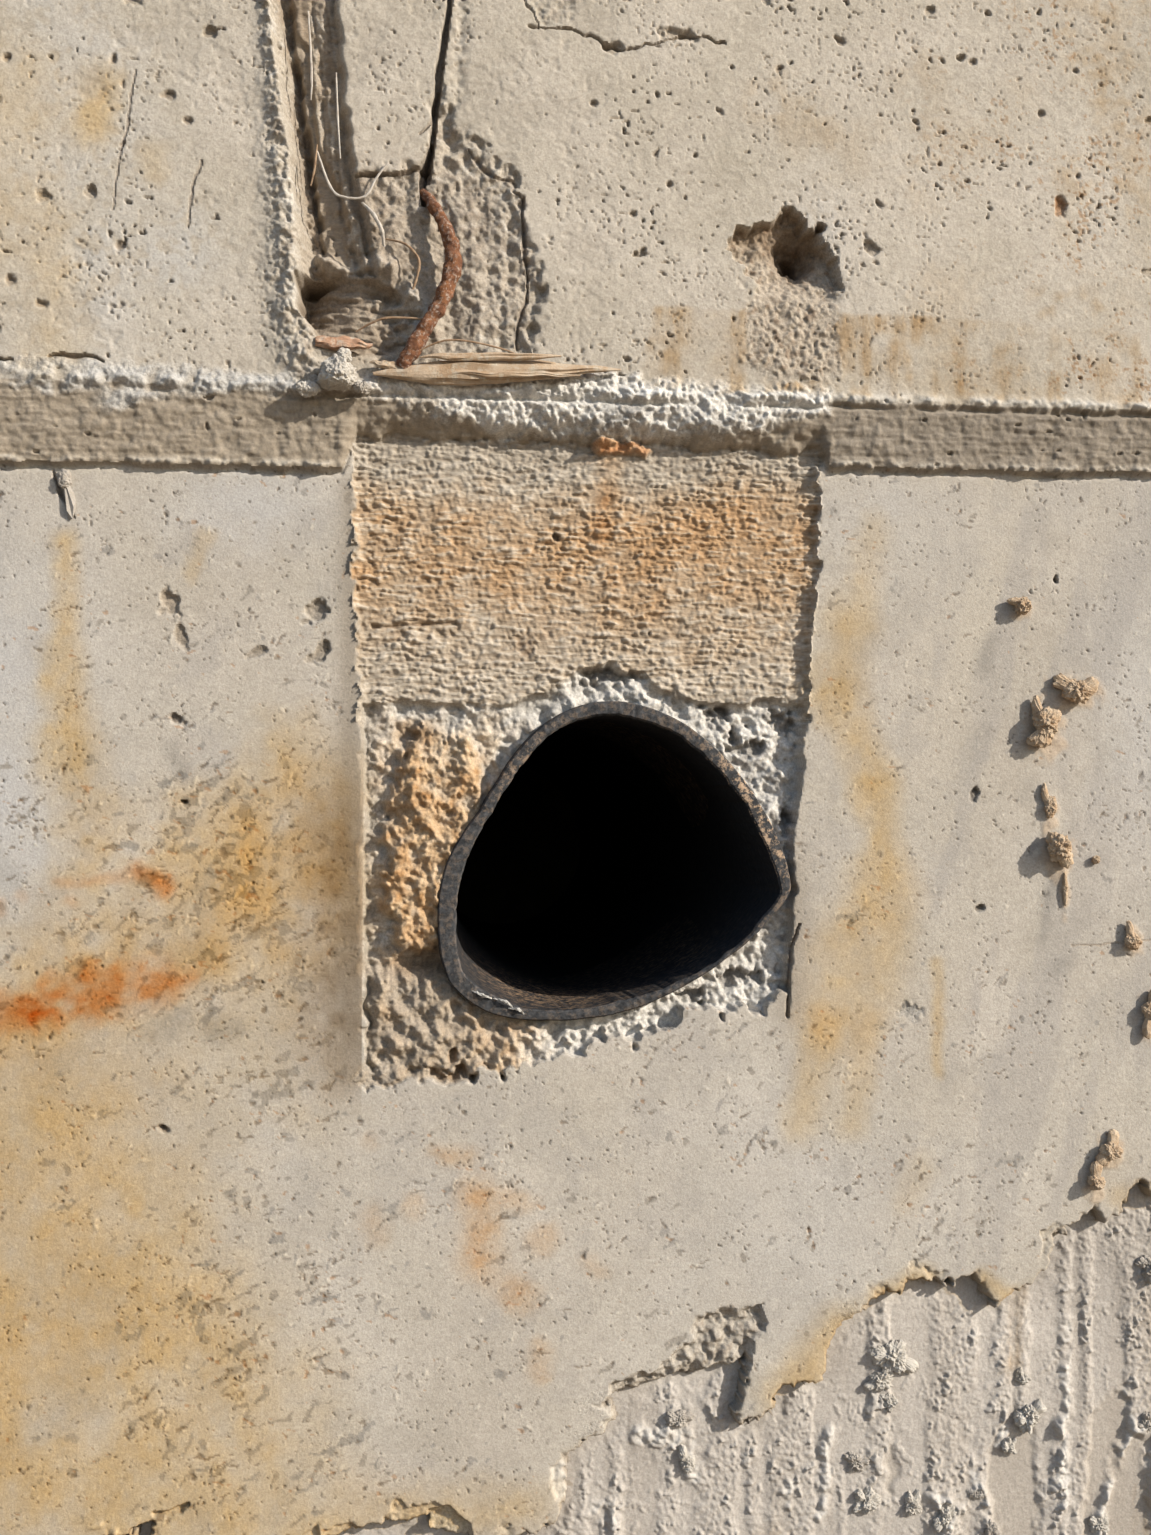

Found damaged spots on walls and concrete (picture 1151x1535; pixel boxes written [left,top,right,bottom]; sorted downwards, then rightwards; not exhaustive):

spalling [258,0,549,384]
rust [396,188,463,369]
crack [355,0,531,352]
crack [523,0,727,53]
spalling [725,201,845,386]
spalling [351,664,806,1093]
peeling [116,1506,235,1535]
peeling [281,1160,1151,1535]